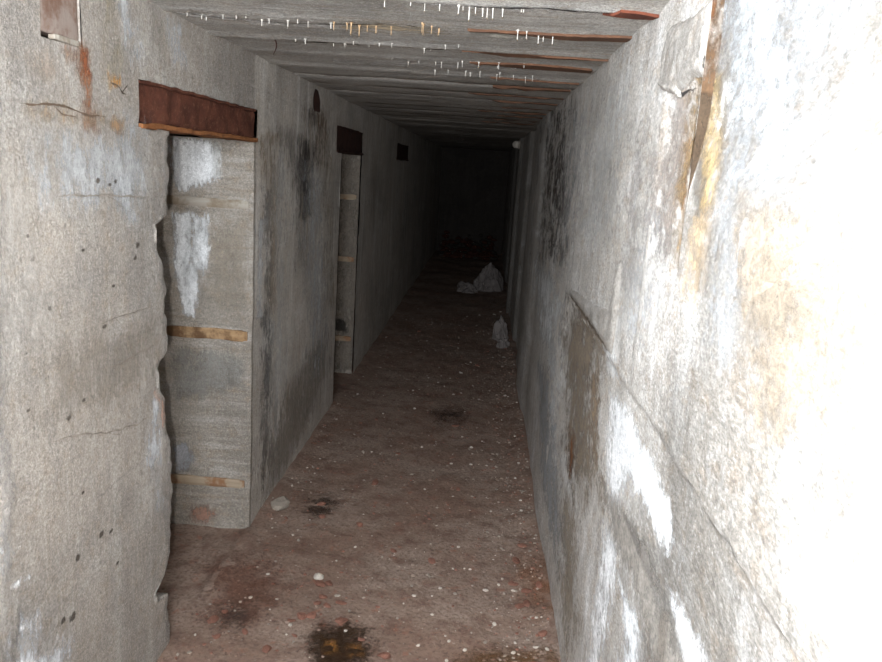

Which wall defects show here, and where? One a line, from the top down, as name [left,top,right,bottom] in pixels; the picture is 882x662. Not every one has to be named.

rust [65,44,96,130]
damp [44,115,145,221]
damp [170,138,217,191]
damp [174,213,210,318]
damp [300,140,360,379]
damp [714,0,882,480]